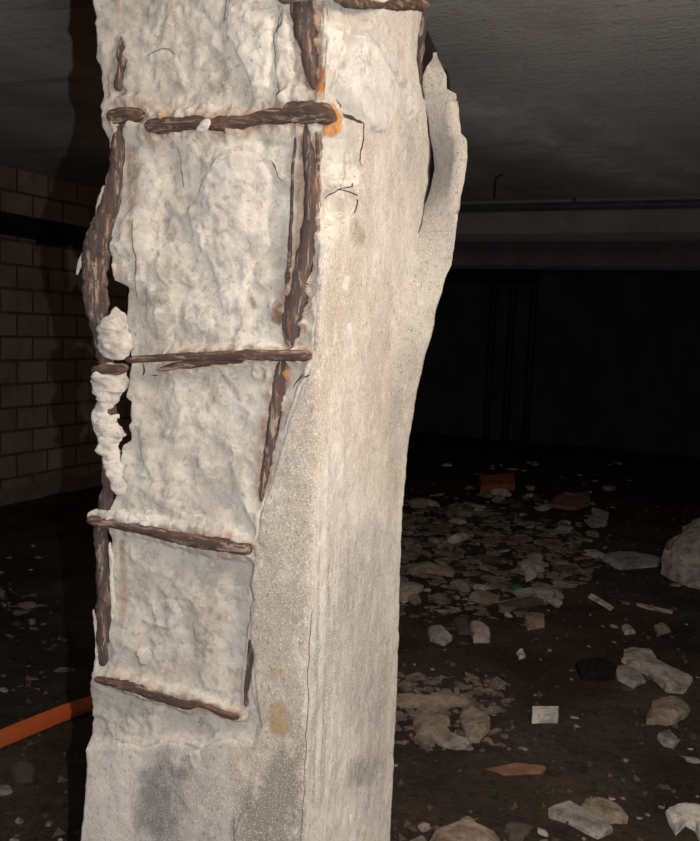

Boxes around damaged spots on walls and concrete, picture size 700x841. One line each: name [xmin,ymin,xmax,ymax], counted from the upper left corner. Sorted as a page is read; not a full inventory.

rust [313,14,343,136]
crack [325,99,364,214]
spalling [76,0,428,769]